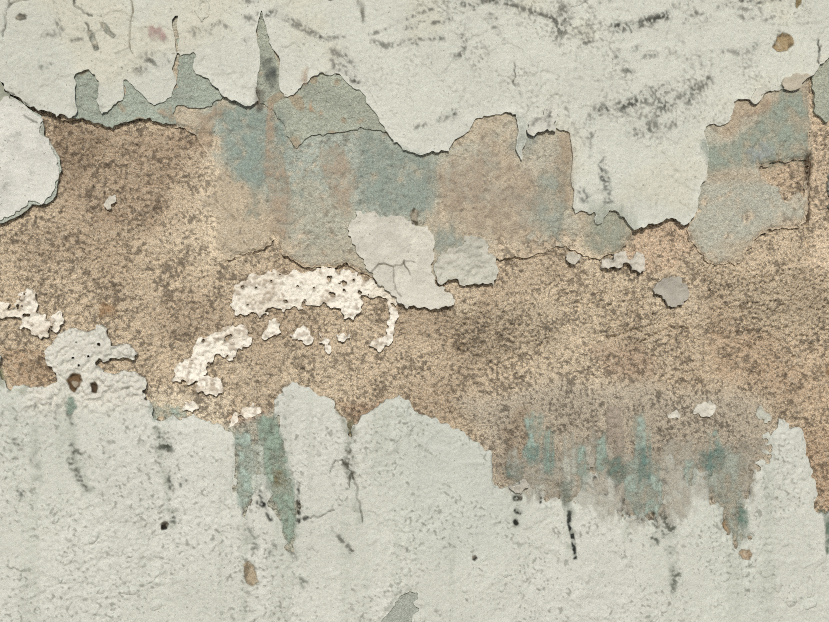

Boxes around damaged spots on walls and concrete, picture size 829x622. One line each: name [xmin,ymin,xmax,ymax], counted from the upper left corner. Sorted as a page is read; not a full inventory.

spalling [773,33,794,52]
peeling [61,11,634,284]
spalling [0,58,829,553]
water stain [250,415,295,541]
water stain [507,407,632,515]
water stain [649,432,763,525]
peeling [381,592,419,622]